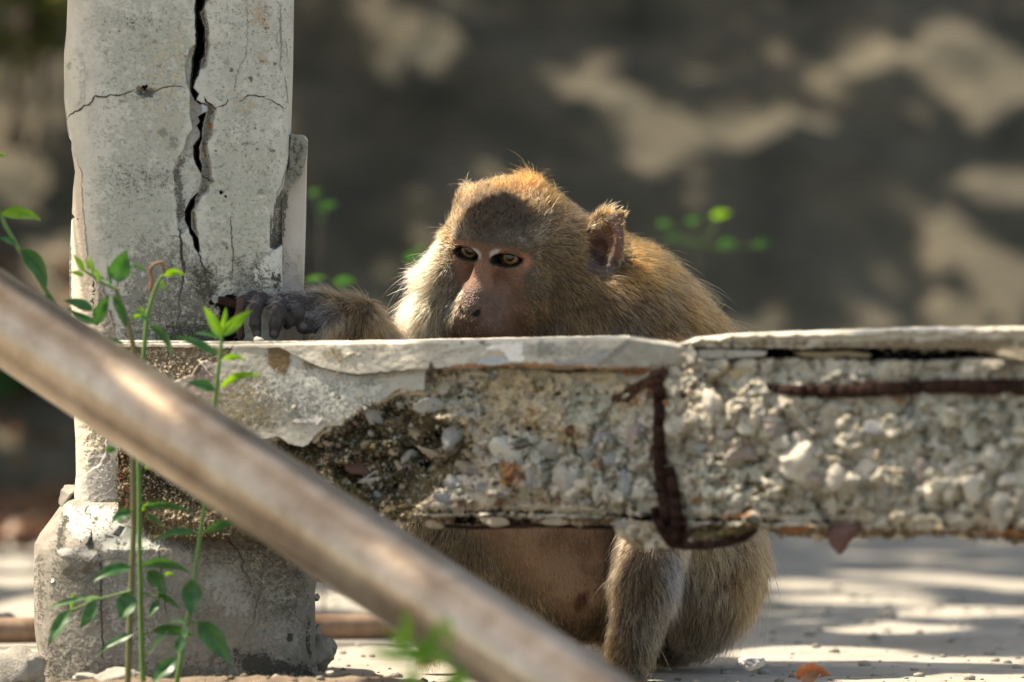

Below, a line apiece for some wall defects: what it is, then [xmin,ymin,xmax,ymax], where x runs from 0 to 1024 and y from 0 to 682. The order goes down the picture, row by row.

crack [66,0,290,325]
spalling [235,330,1024,554]